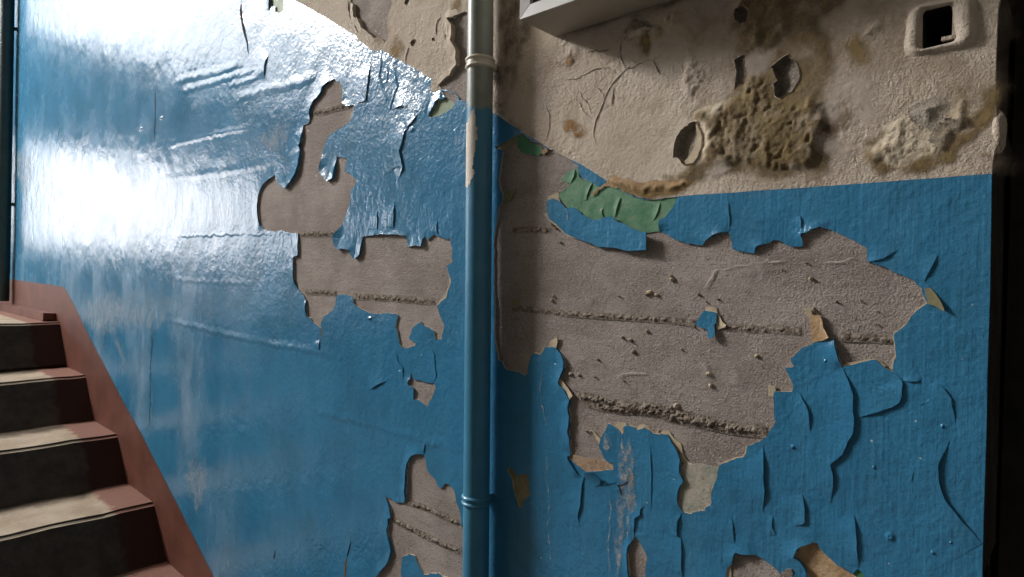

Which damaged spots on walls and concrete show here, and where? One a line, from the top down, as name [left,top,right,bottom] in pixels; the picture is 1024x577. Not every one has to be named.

peeling [251,0,452,348]
spalling [377,3,478,188]
crack [563,40,665,145]
spalling [672,120,703,166]
spalling [733,54,747,90]
damp [615,0,871,199]
spalling [770,53,801,99]
damp [910,89,999,171]
peeling [403,371,436,406]
peeling [495,134,982,577]
peeling [370,442,463,577]